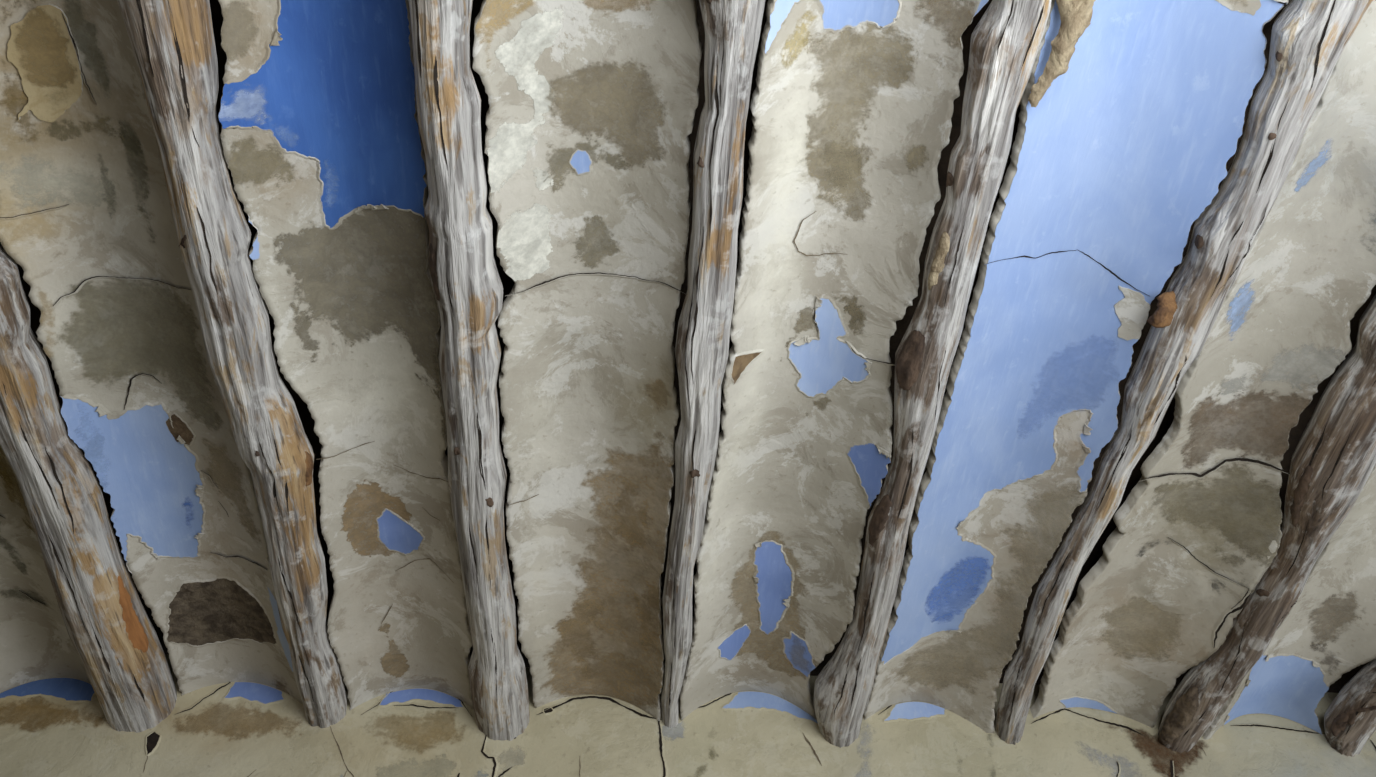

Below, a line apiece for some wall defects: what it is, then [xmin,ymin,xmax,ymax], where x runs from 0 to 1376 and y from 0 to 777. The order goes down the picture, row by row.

peeling [218,0,427,230]
damp [475,0,665,281]
peeling [765,0,902,56]
damp [783,14,914,221]
damp [274,207,446,436]
crack [505,272,687,296]
crack [985,250,1150,297]
peeling [881,0,1288,666]
peeling [60,394,294,673]
damp [544,433,673,707]
crack [330,691,668,777]
crack [1031,708,1145,736]